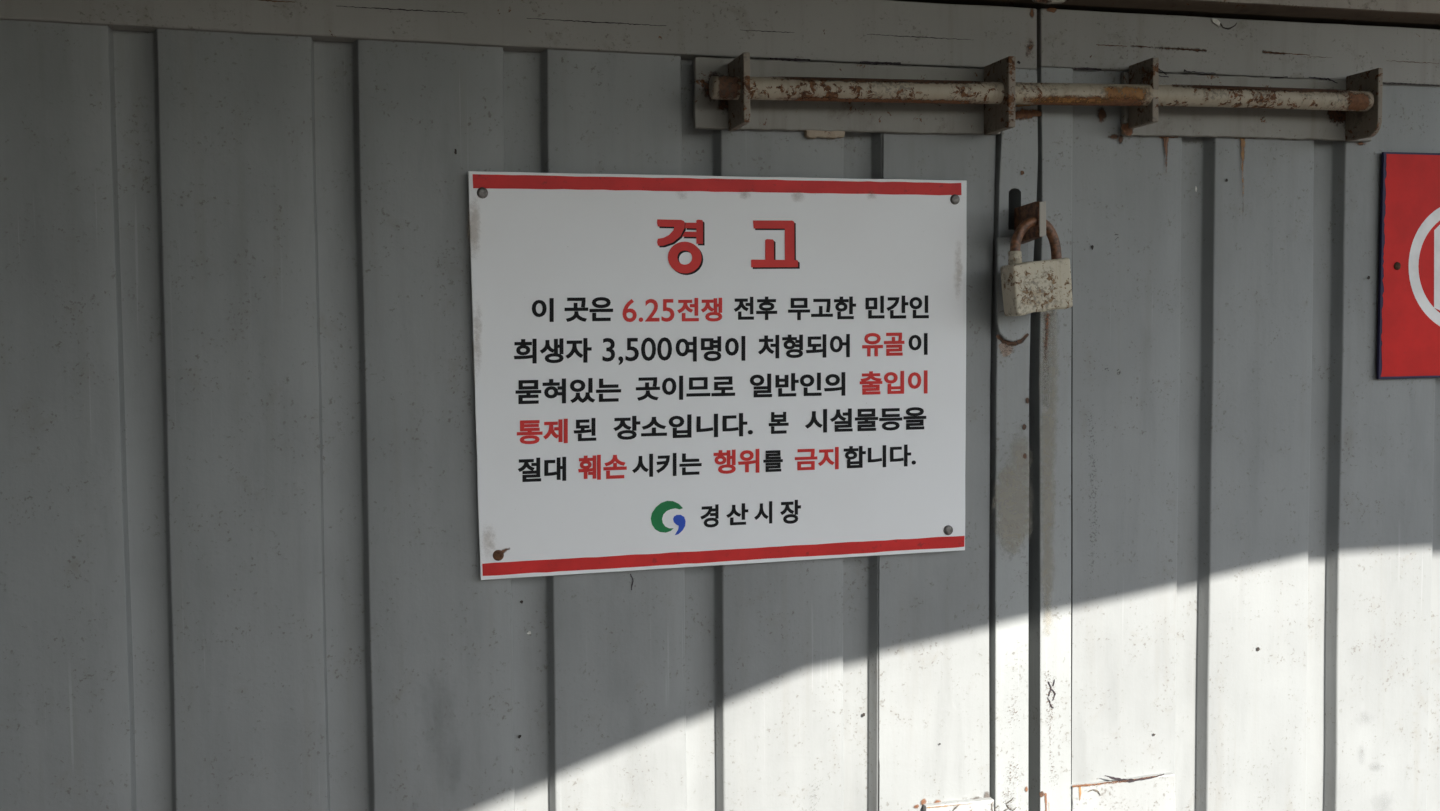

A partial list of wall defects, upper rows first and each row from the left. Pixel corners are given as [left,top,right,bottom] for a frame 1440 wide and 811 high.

corrosion [1015,86,1148,144]
corrosion [1173,85,1370,128]
corrosion [1159,136,1178,167]